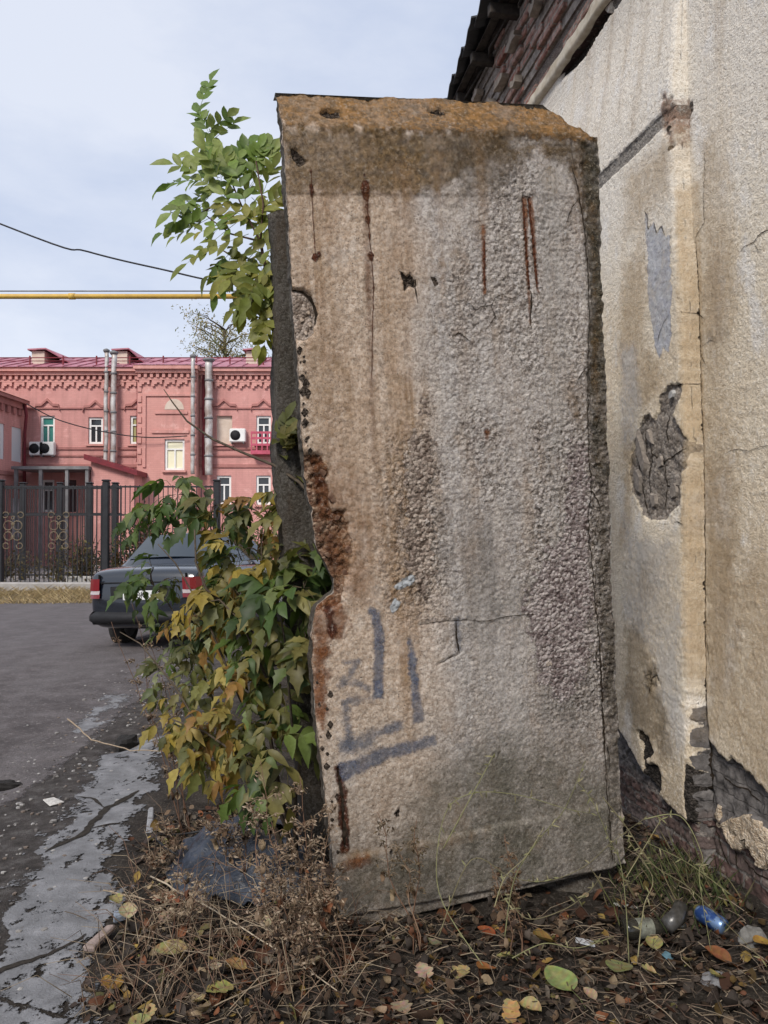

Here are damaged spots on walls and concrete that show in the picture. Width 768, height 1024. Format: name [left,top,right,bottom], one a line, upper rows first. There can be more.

spalling [291,149,305,167]
corrosion [310,170,321,262]
corrosion [361,173,375,377]
spalling [400,271,418,302]
corrosion [522,196,542,325]
flaking render [598,94,693,189]
spalling [292,290,352,611]
corrosion [310,455,346,568]
flaking render [630,385,703,520]
corrosion [313,598,344,730]
crack [420,614,534,664]
flaking render [617,706,768,908]